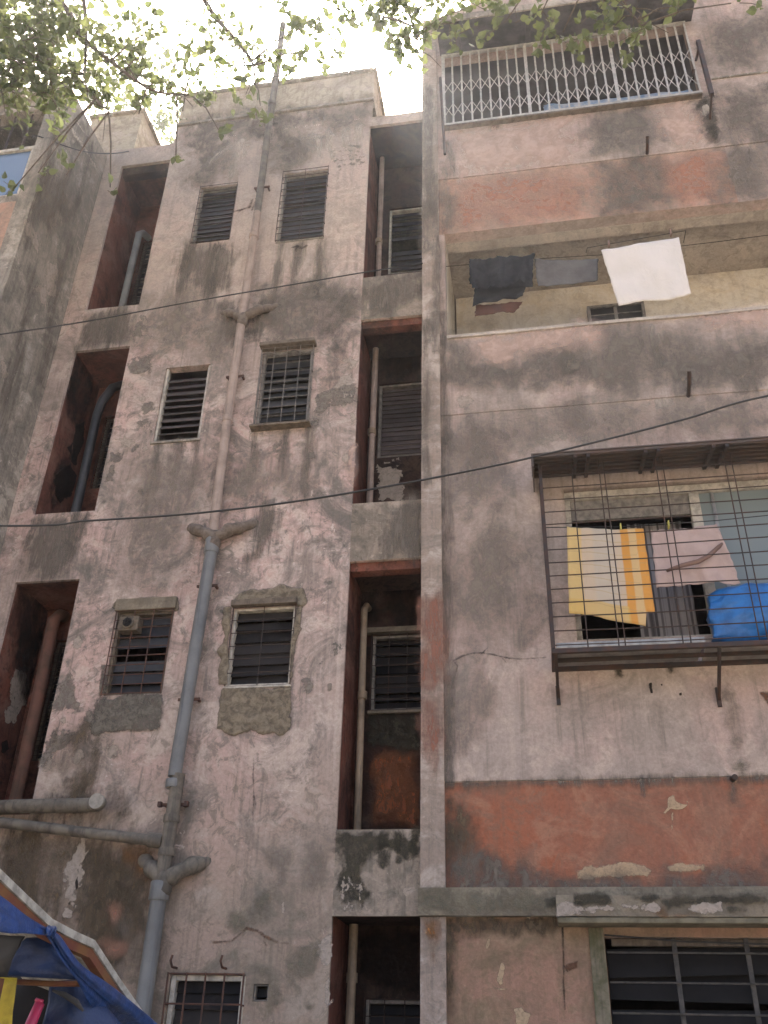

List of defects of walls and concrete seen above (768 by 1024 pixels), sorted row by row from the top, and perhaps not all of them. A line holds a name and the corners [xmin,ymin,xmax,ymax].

water stain [712,17,768,68]
water stain [420,86,768,441]
flaking render [4,669,27,726]
corrosion [373,752,420,829]
peeling [663,795,688,827]
flaking render [62,838,87,918]
water stain [335,827,420,909]
peeling [577,862,651,880]
peeling [668,863,705,871]
spalling [556,901,661,917]
spalling [688,902,723,915]
crack [214,928,276,943]